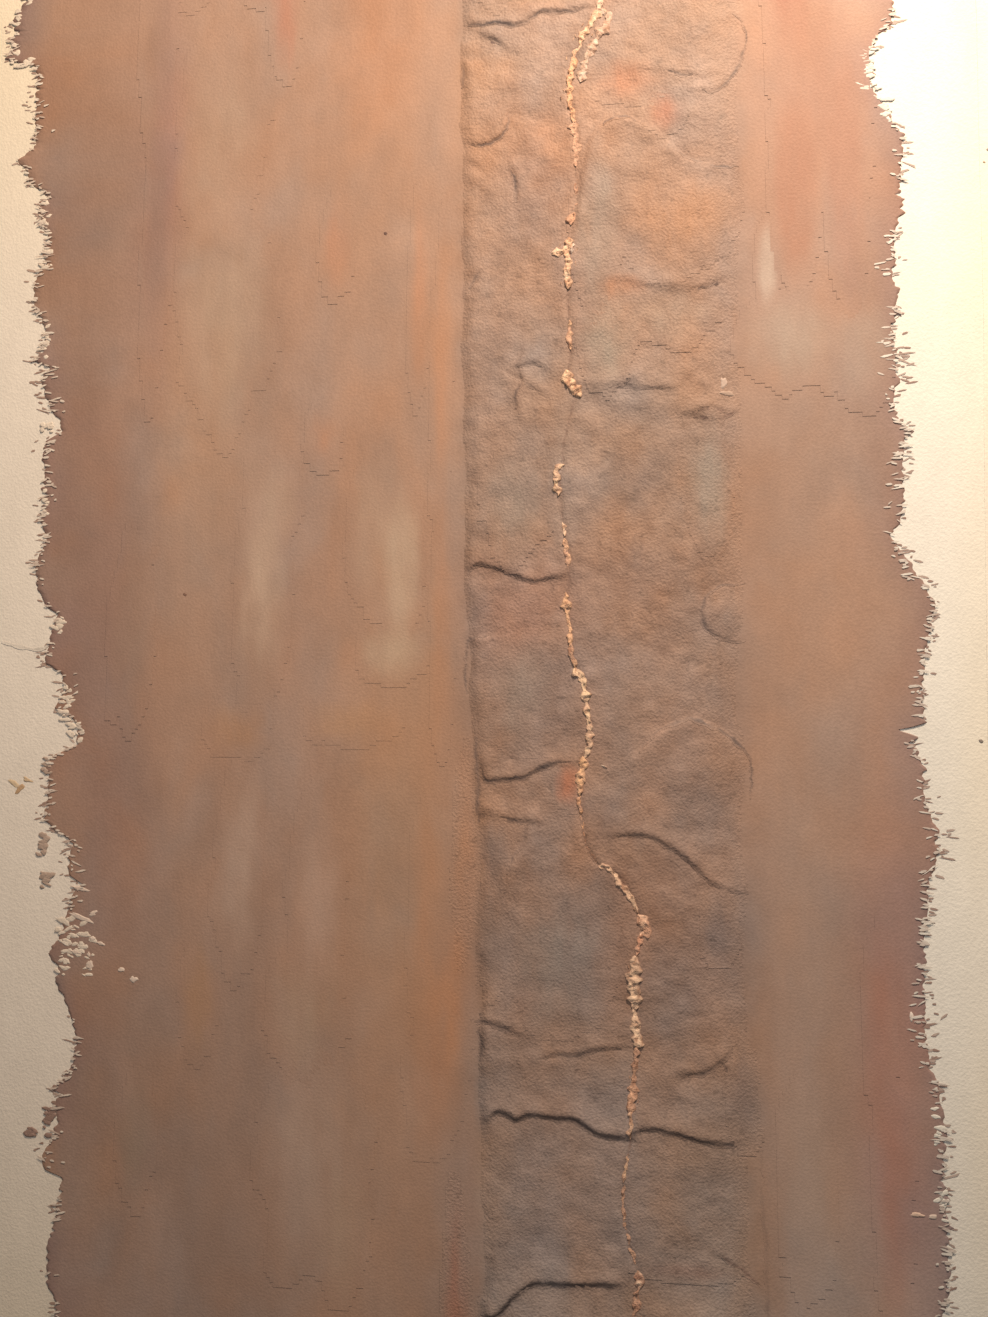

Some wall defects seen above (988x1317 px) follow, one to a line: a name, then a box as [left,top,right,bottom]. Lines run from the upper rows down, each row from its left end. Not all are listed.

crack [459,64,467,88]
corrosion [758,0,878,318]
crack [463,0,749,1317]
crack [722,1255,761,1288]